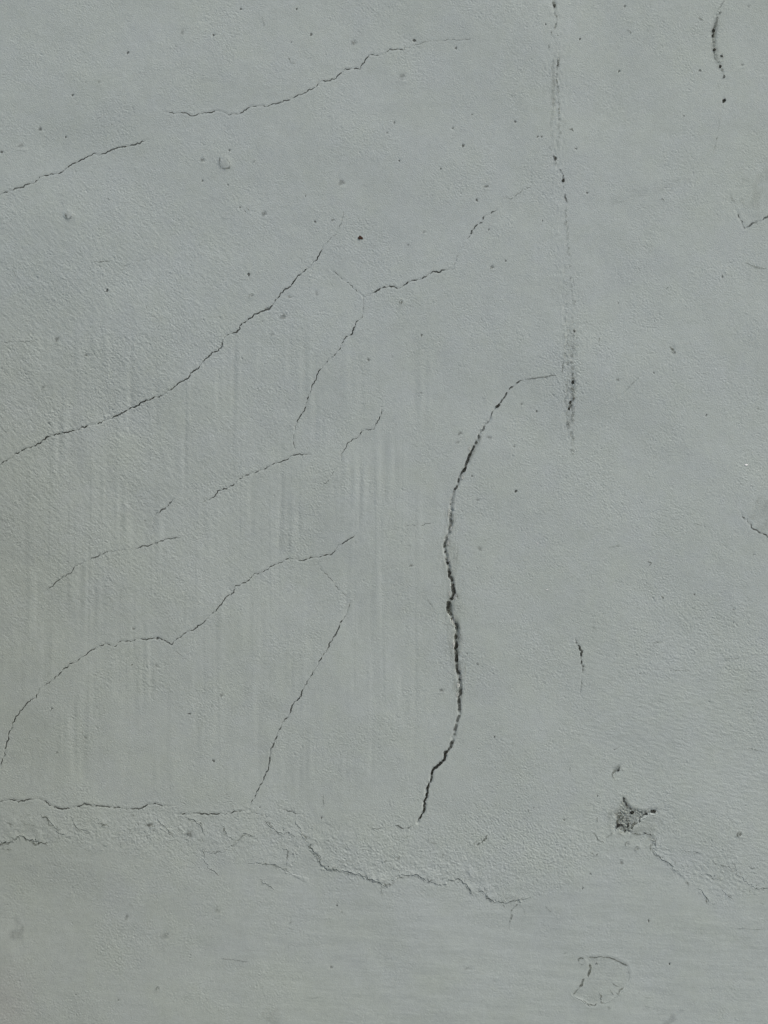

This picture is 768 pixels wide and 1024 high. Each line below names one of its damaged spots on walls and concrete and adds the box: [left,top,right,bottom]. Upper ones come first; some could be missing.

crack [2,251,321,463]
crack [400,435,479,829]
spalling [617,798,658,835]